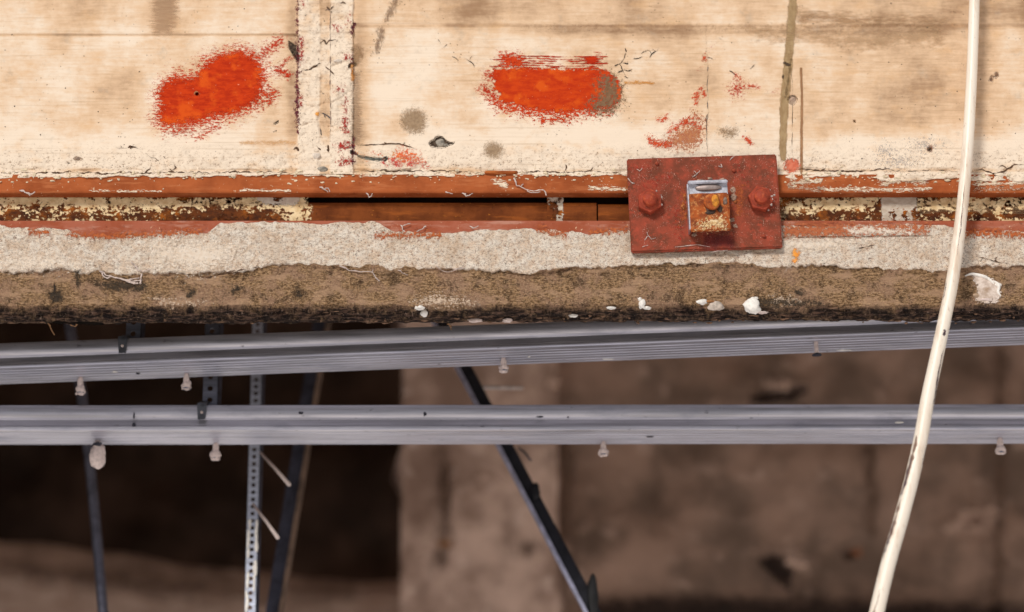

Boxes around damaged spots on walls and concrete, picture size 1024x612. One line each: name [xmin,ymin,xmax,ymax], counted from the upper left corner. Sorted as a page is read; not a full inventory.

water stain [779,0,943,193]
peeling [0,197,313,221]
peeling [779,197,882,221]
peeling [916,197,1024,221]